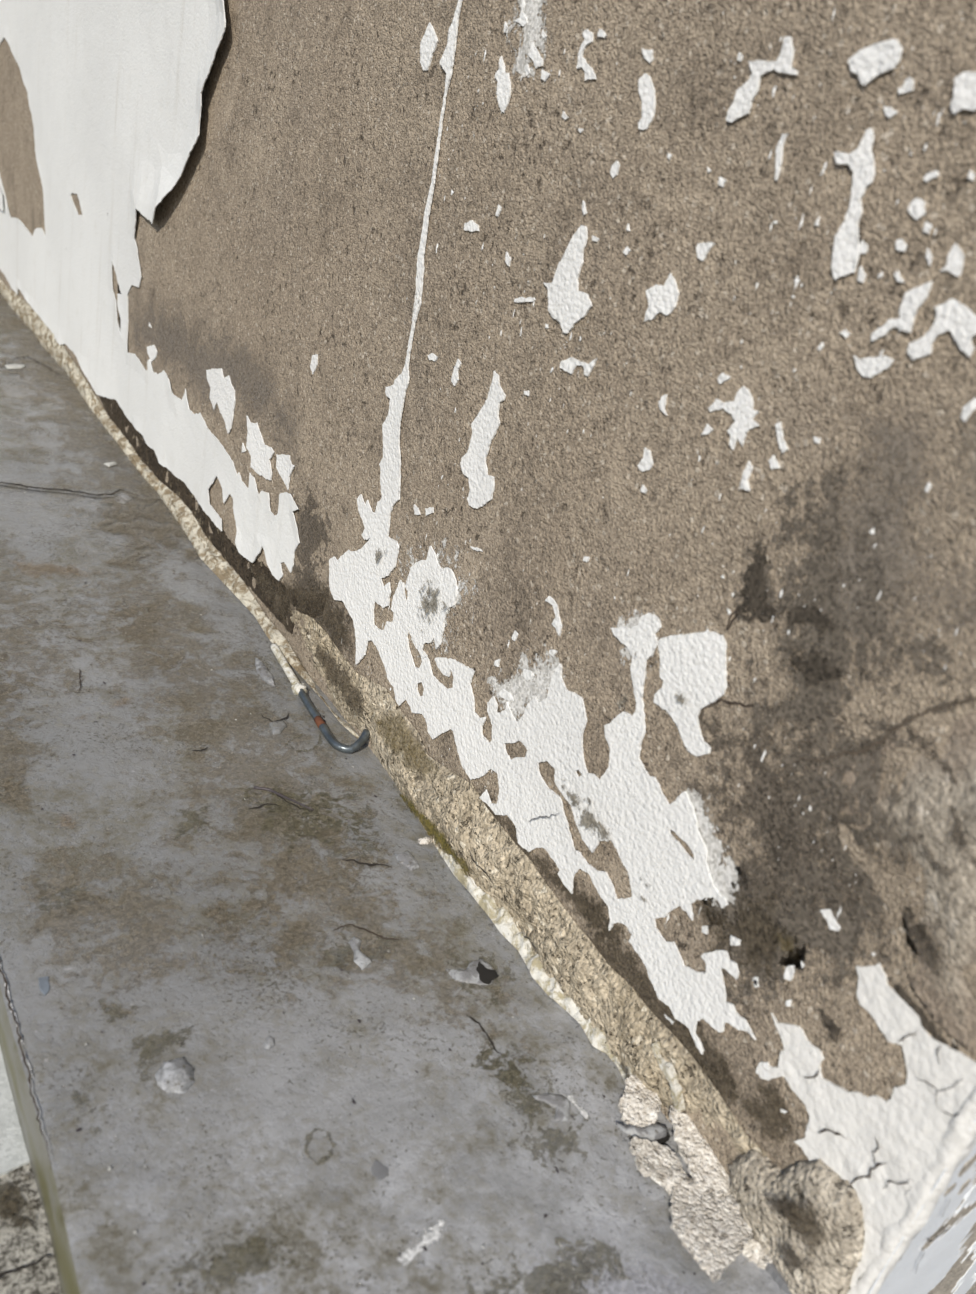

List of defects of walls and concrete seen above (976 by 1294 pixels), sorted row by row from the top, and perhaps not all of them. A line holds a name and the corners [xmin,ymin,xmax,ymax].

peeling [0,38,46,236]
peeling [71,193,82,215]
peeling [112,266,121,300]
crack [0,482,138,496]
peeling [127,0,976,1172]
crack [705,698,779,711]
damp [674,428,975,1050]
crack [793,695,976,865]
spalling [616,1075,865,1294]
peeling [918,1154,976,1294]